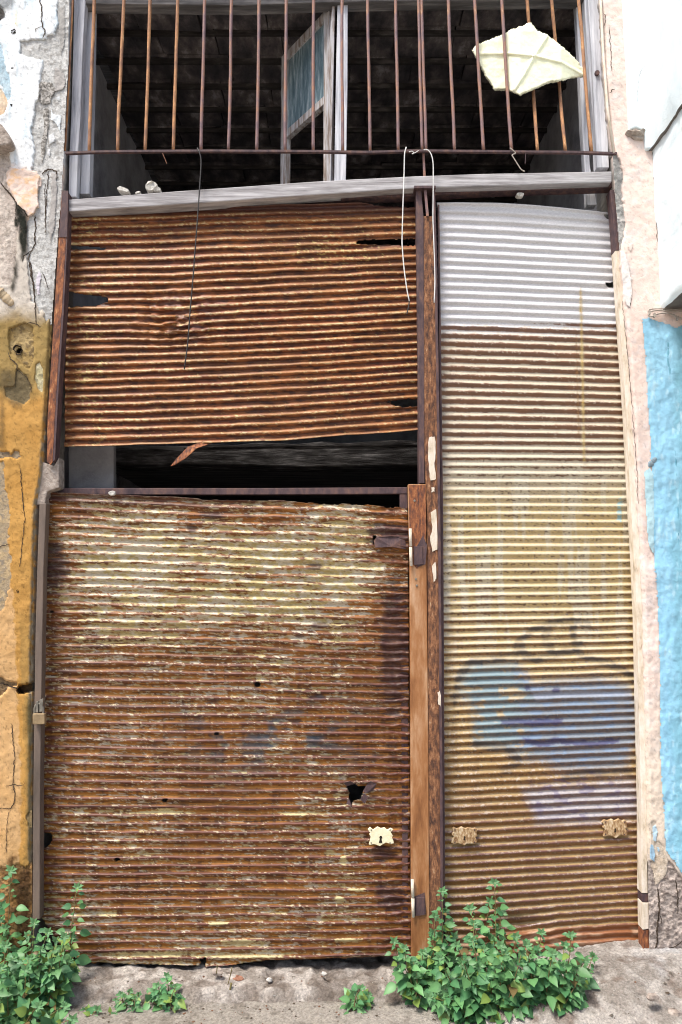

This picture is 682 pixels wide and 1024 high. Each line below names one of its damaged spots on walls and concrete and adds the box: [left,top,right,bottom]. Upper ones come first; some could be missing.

flaking render [0,0,69,325]
crack [0,468,25,567]
crack [0,728,22,853]
flaking render [648,821,682,949]